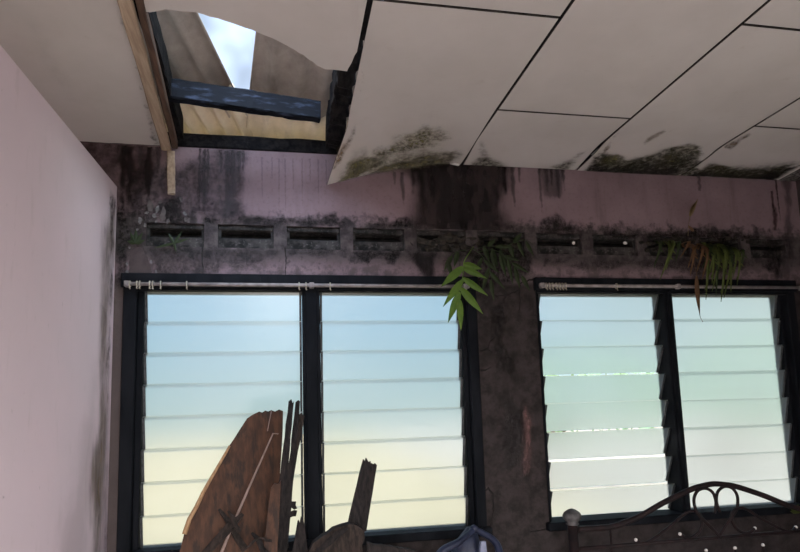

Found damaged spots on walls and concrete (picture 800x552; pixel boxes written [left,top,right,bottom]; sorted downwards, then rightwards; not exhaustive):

damp [373,157,520,231]
damp [538,162,572,202]
damp [588,144,800,202]
damp [85,137,344,356]
mould [355,251,400,264]
damp [412,253,434,276]
damp [92,388,106,529]